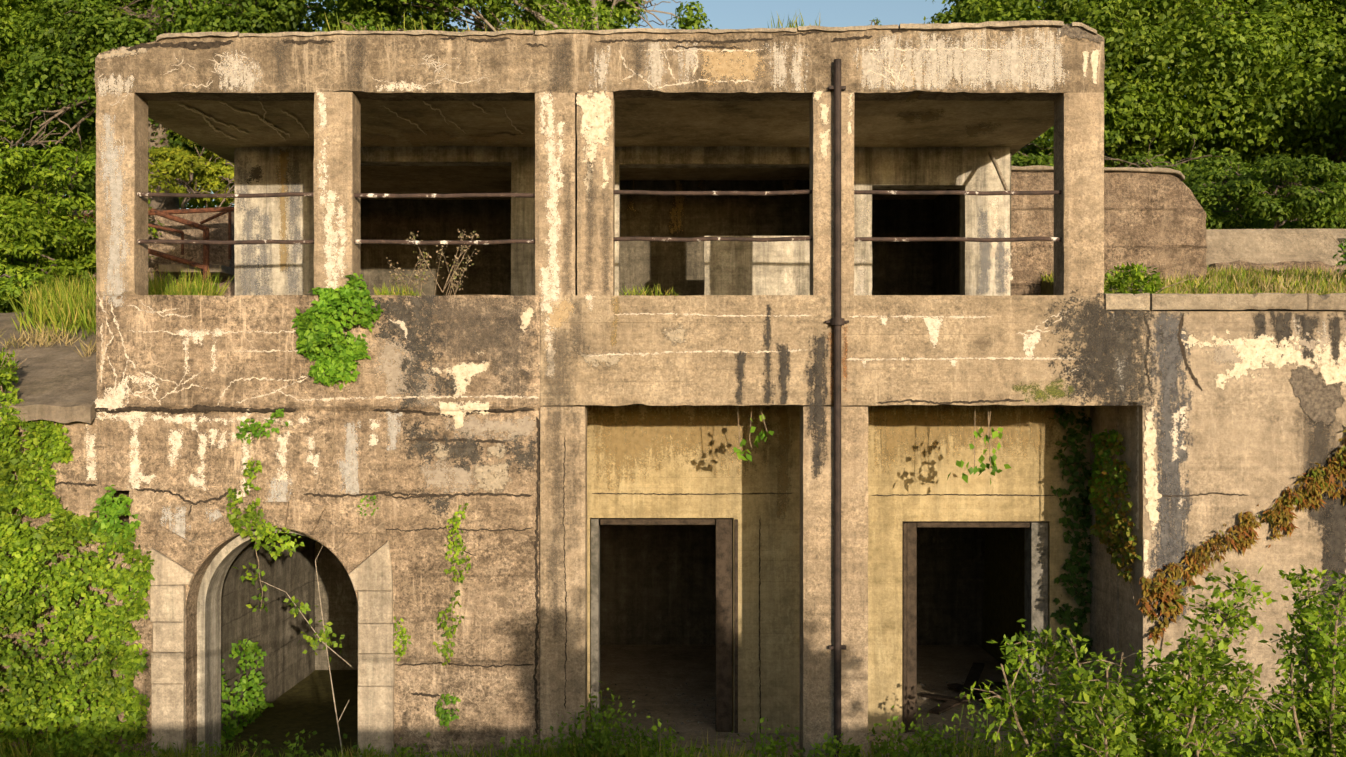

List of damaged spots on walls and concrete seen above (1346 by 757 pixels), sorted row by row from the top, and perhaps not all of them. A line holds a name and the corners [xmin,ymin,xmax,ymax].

peeling [576,90,612,202]
peeling [668,180,704,235]
spalling [419,351,541,494]
water stain [587,305,829,518]
corrosion [829,327,848,403]
peeling [1181,327,1346,426]
water stain [1252,310,1346,362]
crack [95,293,812,734]
water stain [1305,416,1346,655]